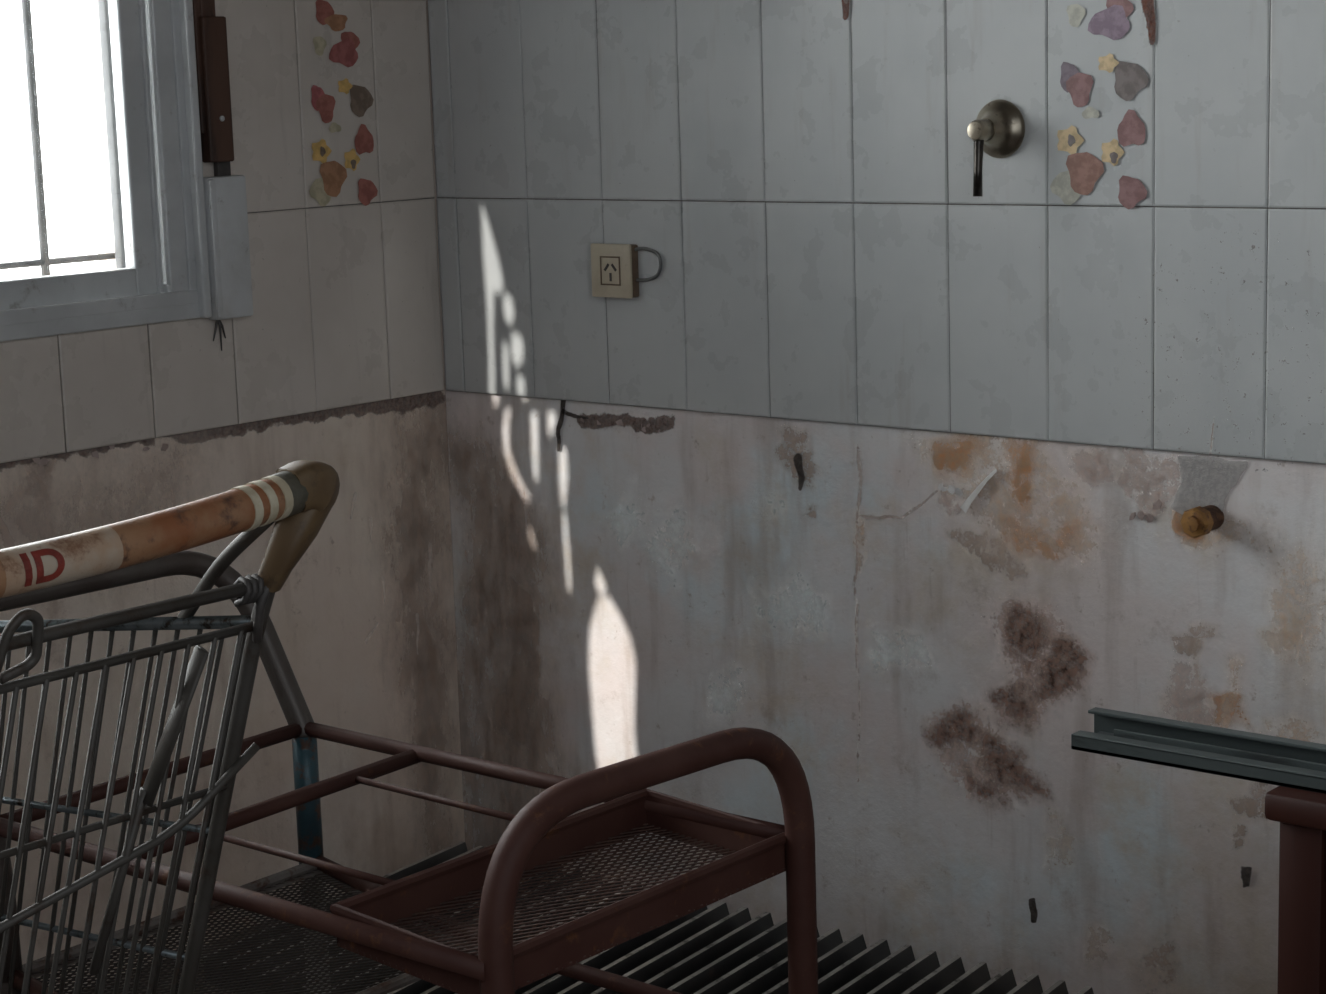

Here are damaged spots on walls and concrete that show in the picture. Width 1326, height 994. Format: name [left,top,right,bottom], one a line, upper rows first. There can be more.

peeling [577,413,675,434]
spalling [778,430,815,491]
peeling [938,468,997,513]
spalling [1074,449,1179,523]
crack [854,447,937,654]
damp [387,397,553,854]
damp [989,604,1088,722]
damp [925,707,1050,804]